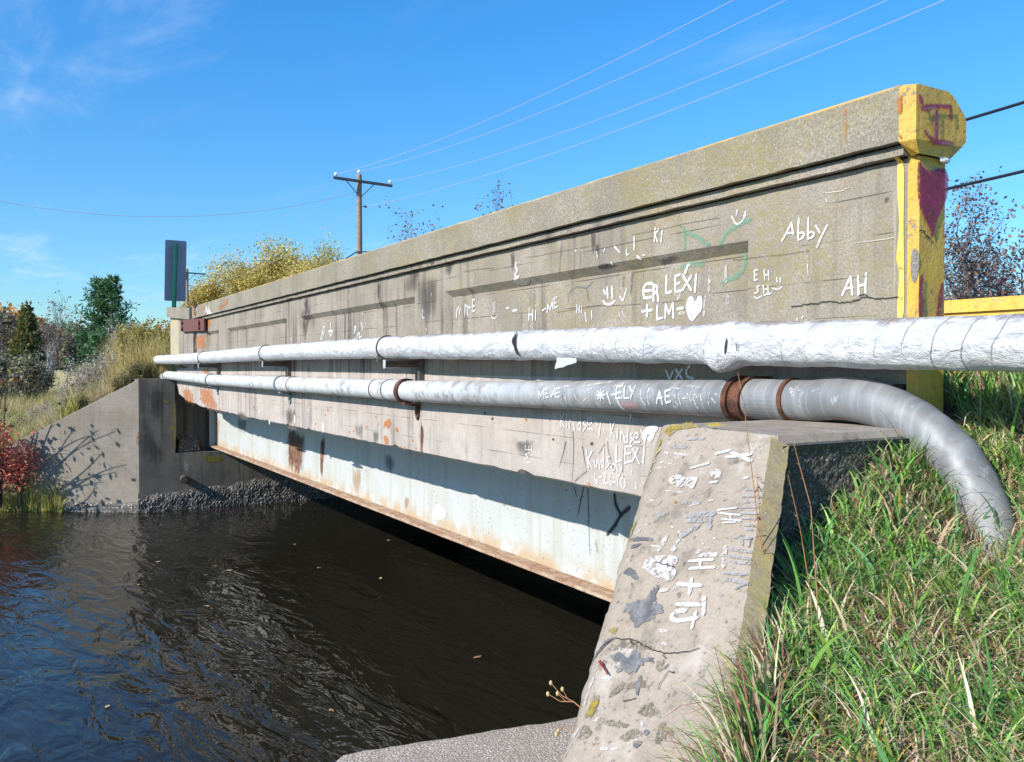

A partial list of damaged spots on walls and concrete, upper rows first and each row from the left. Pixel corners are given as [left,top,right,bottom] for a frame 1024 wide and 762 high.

crack [791,294,898,307]
corrosion [183,368,219,435]
corrosion [287,429,303,473]
corrosion [349,416,423,453]
crack [600,637,698,701]